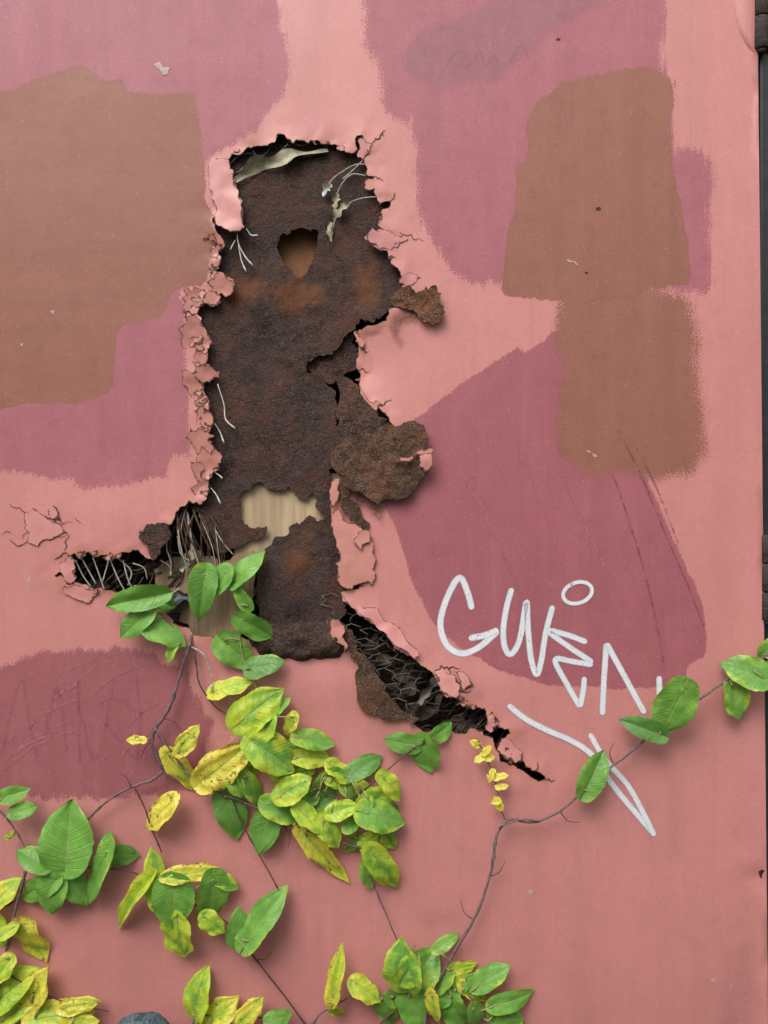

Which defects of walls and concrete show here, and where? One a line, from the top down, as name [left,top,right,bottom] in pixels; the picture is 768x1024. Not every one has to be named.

peeling [310,136,373,160]
peeling [364,216,402,260]
peeling [399,272,421,286]
peeling [178,148,245,496]
rust [188,135,445,724]
crack [2,505,81,560]
peeling [24,509,67,547]
peeling [59,550,122,603]
peeling [329,476,419,659]
crack [435,665,474,698]
peeling [434,668,523,765]